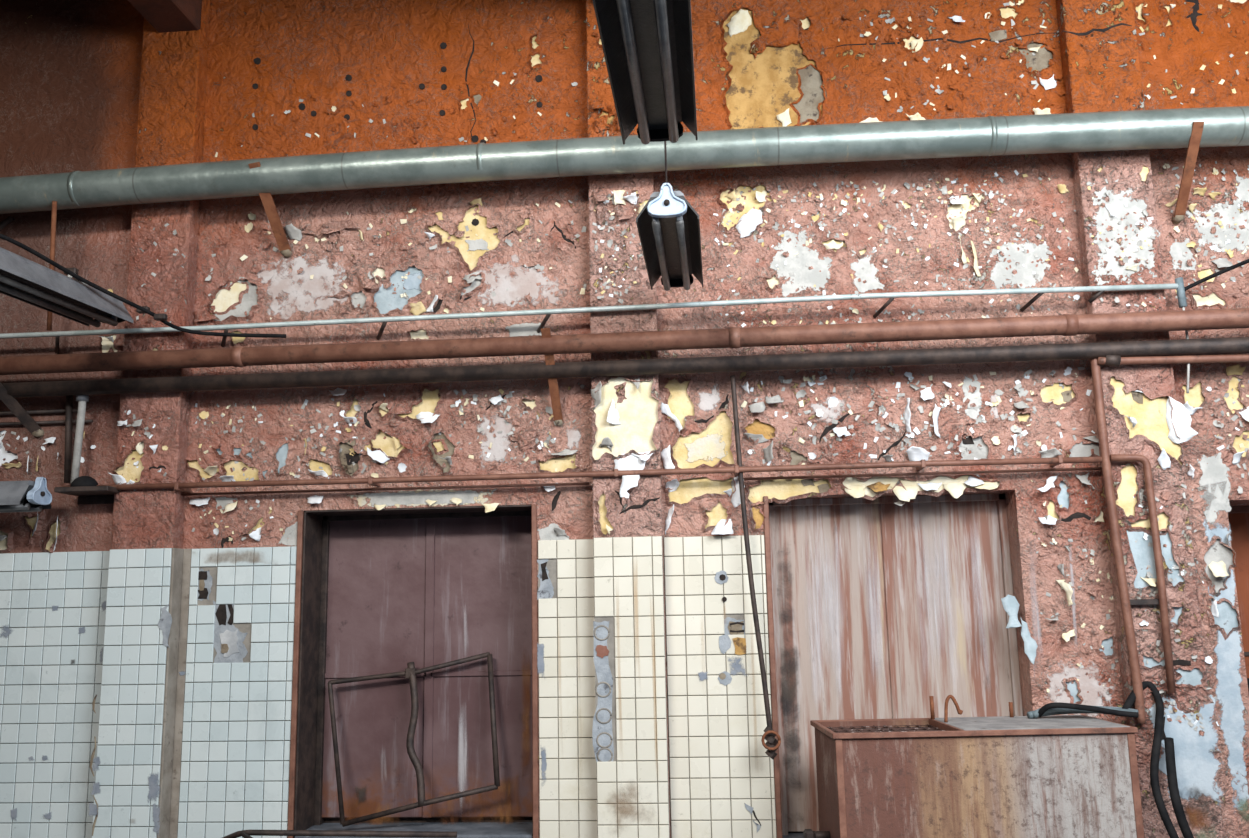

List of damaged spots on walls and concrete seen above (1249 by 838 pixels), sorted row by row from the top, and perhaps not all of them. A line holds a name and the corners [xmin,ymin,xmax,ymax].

crack [465,25,476,137]
peeling [720,6,830,130]
crack [1185,0,1202,32]
peeling [194,185,650,347]
peeling [713,159,1249,328]
peeling [98,334,122,353]
peeling [0,427,96,474]
peeling [109,410,170,499]
spalling [158,604,172,648]
peeling [185,364,1249,810]